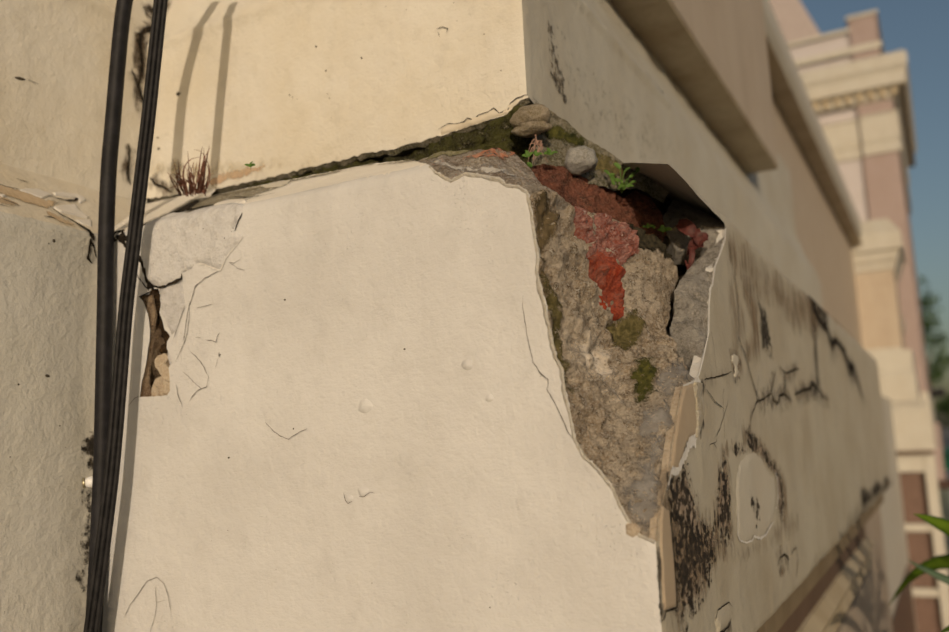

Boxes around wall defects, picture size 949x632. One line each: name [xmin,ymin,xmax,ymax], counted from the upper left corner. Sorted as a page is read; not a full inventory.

mould [548,23,567,103]
peeling [0,179,92,227]
crack [174,304,219,405]
spalling [140,95,726,622]
damp [729,243,818,360]
crack [704,244,866,445]
mould [667,430,787,632]